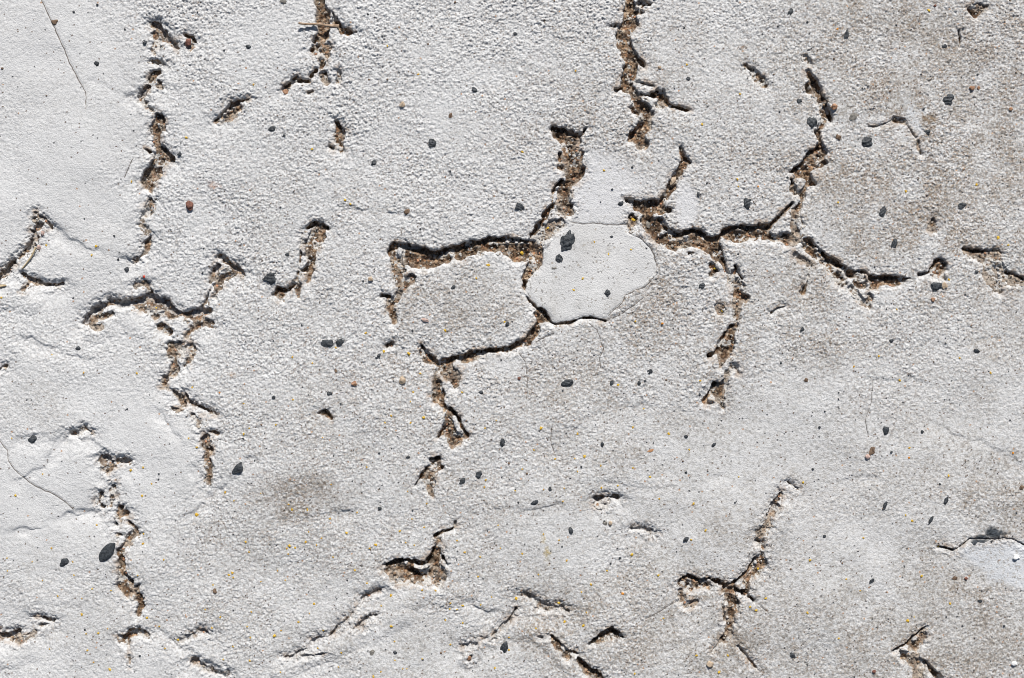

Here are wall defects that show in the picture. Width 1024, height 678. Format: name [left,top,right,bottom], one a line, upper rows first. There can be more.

crack [282,0,353,95]
crack [609,0,689,150]
crack [0,211,65,294]
crack [83,21,246,485]
crack [273,220,329,302]
peeling [526,224,655,322]
crack [380,54,909,497]
crack [0,441,150,664]
crack [284,588,383,661]
crack [461,592,604,678]
crack [645,481,799,672]
crack [892,626,942,678]